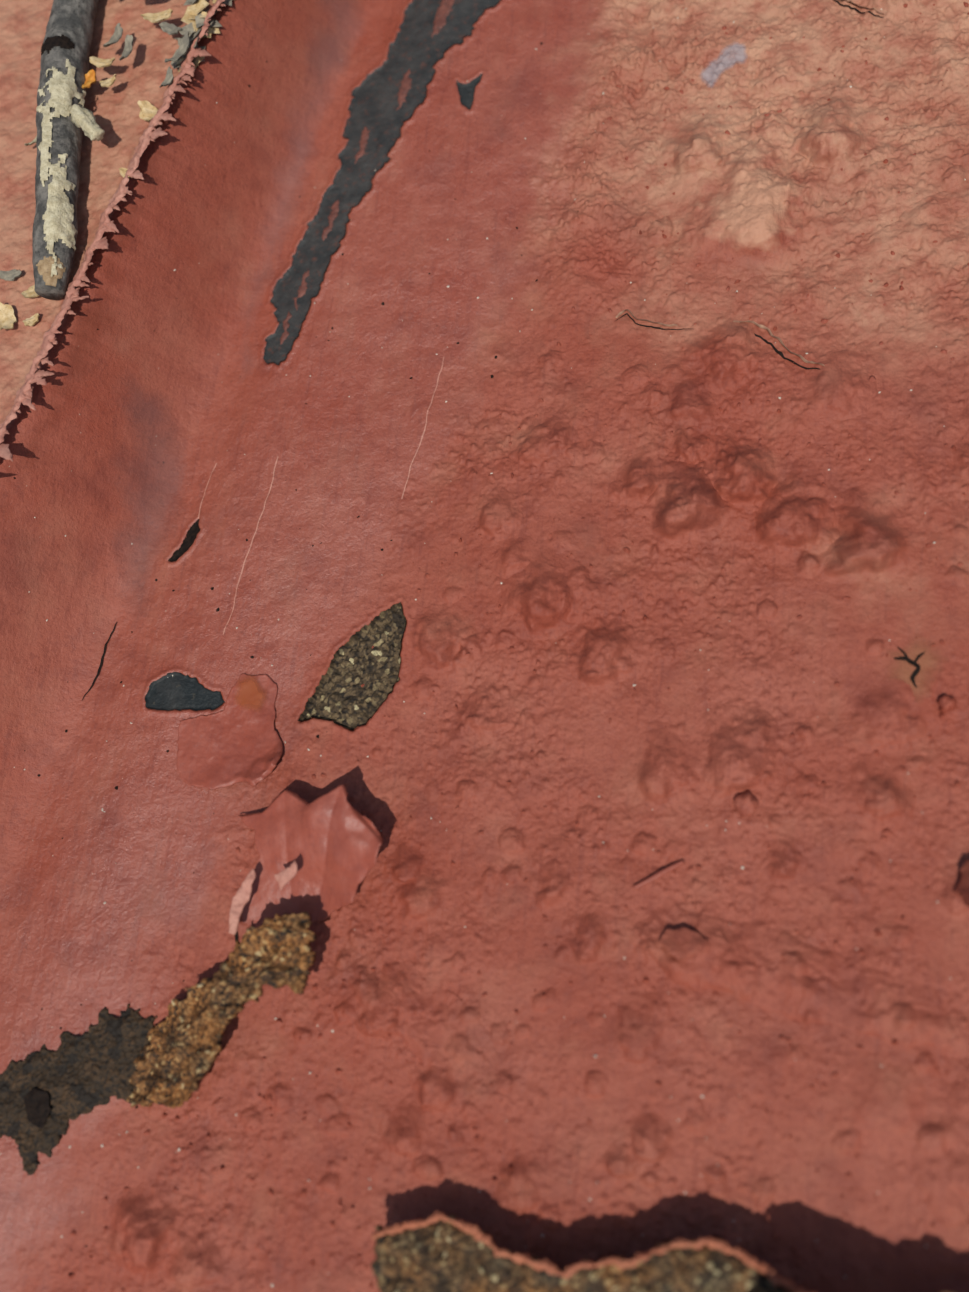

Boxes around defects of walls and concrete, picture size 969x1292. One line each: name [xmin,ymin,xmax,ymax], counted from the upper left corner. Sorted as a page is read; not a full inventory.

peeling [263,0,500,365]
peeling [168,519,200,562]
peeling [145,672,225,711]
spalling [0,784,383,1175]